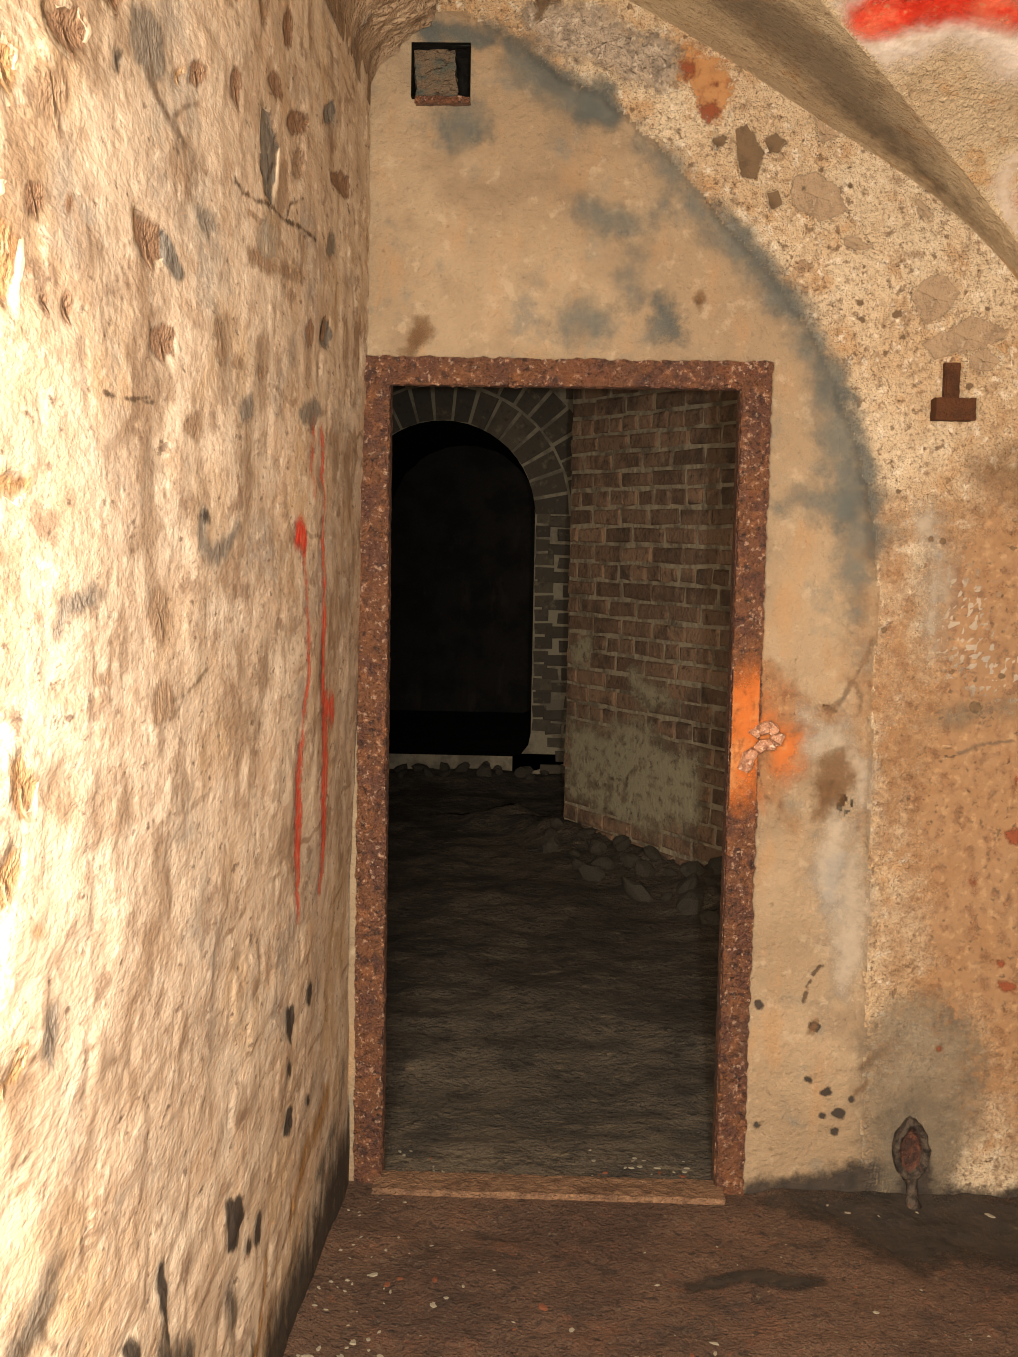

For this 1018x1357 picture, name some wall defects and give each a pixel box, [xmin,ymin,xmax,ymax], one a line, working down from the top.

water stain [420,22,618,126]
water stain [722,0,923,173]
water stain [665,161,887,617]
water stain [915,511,1018,702]
corrosion [730,666,834,807]
water stain [799,711,874,993]
water stain [122,1337,141,1357]
water stain [157,1259,195,1357]
water stain [225,1286,237,1338]
water stain [226,1195,261,1253]
water stain [266,1080,350,1357]
water stain [744,1001,1018,1275]